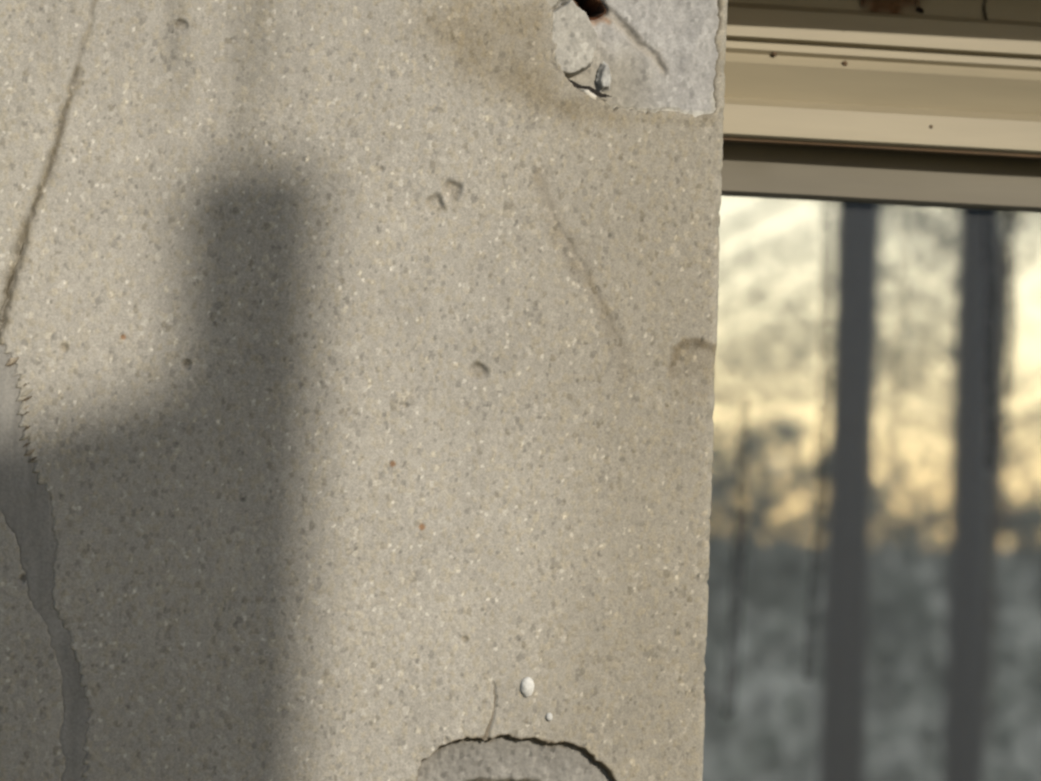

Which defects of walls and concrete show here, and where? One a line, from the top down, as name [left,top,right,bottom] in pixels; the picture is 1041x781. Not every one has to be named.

spalling [547,0,719,117]
corrosion [861,0,924,14]
crack [0,242,91,781]
spalling [417,735,613,781]